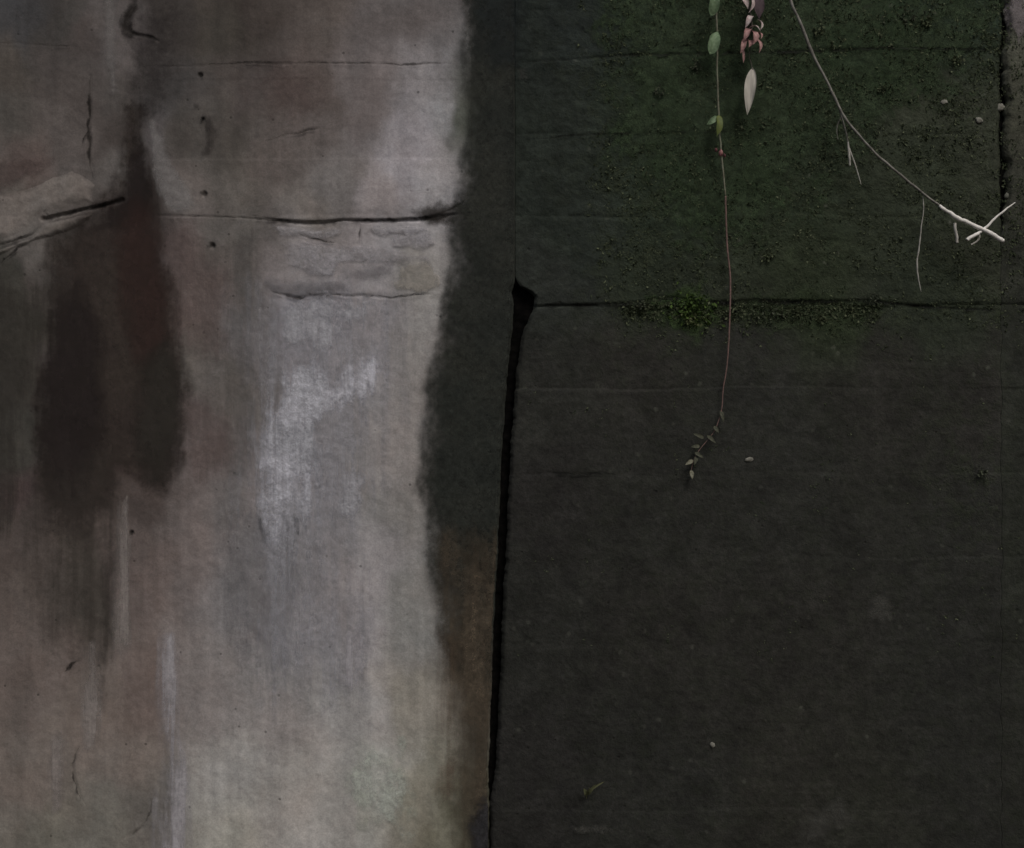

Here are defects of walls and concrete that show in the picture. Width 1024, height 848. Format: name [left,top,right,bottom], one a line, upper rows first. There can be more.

crack [122,4,155,40]
crack [3,200,121,256]
crack [259,215,451,243]
water stain [421,206,458,224]
crack [762,297,838,305]
water stain [35,105,192,748]
efflorescence [260,291,388,643]
crack [488,278,632,848]
water stain [443,537,497,848]